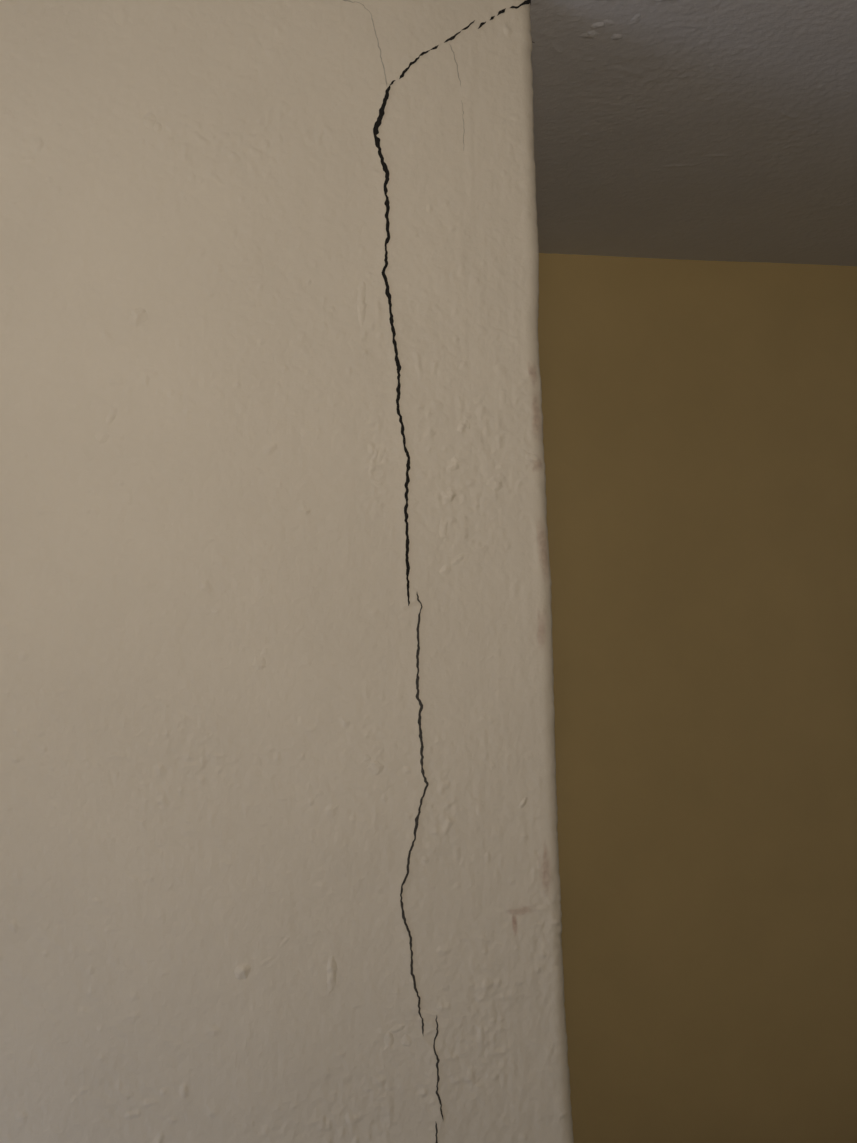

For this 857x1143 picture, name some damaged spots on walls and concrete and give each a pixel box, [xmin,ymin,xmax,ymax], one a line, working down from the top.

crack [343,0,531,1143]